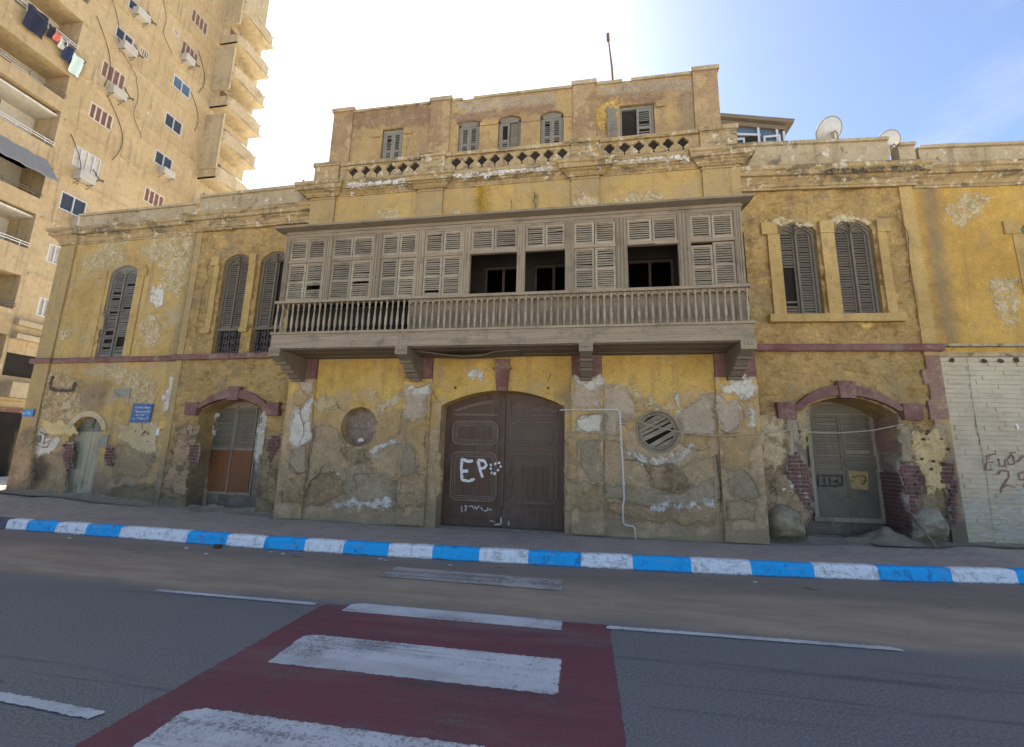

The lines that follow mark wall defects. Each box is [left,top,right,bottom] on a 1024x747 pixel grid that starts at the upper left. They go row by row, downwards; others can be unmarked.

spalling [254,380,434,509]